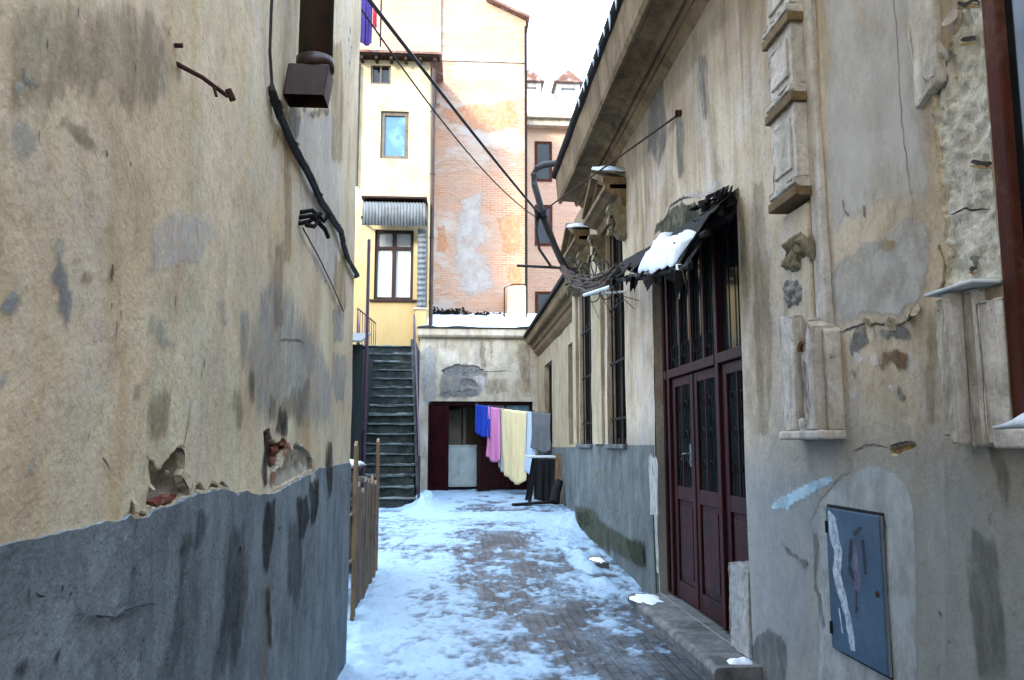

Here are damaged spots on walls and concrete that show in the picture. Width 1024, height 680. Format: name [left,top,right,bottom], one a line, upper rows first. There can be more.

crack [893,0,913,221]
flaking render [849,326,868,356]
flaking render [881,326,909,370]
flaking render [440,363,487,399]
flaking render [123,404,229,517]
flaking render [263,427,316,491]
flaking render [854,441,917,457]